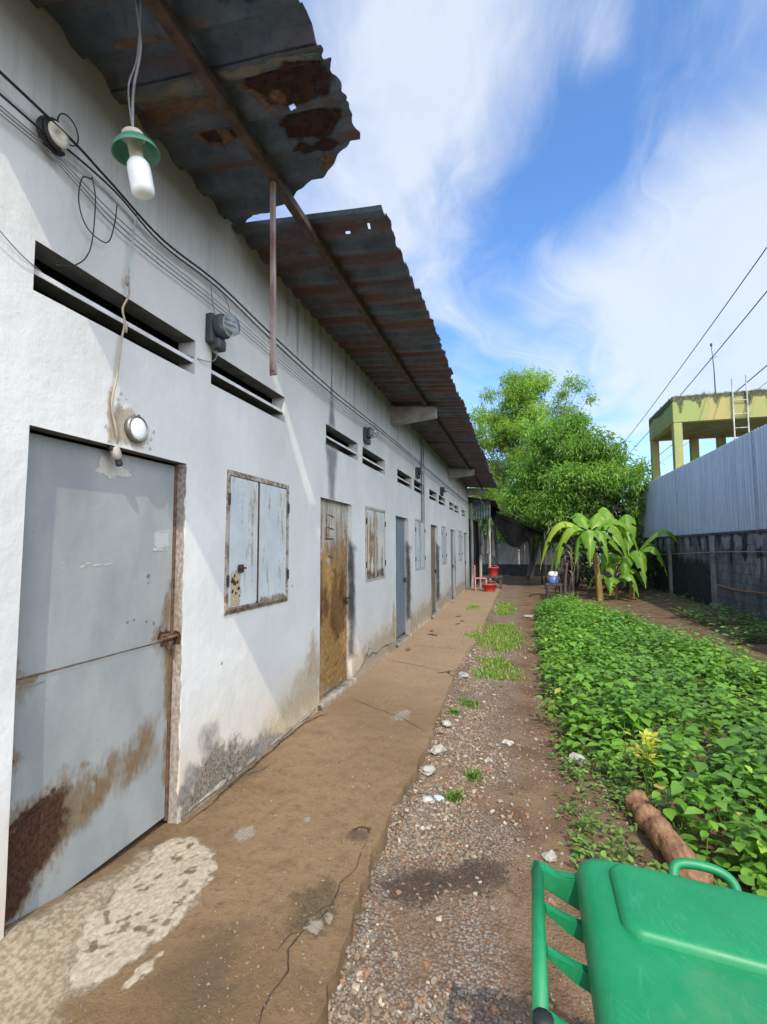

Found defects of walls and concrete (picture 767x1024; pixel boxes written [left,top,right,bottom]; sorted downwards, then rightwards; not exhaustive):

rust [125,77,237,147]
rust [220,53,341,170]
flaking render [105,391,155,450]
rust [367,518,384,578]
rust [226,572,287,615]
rust [319,514,347,699]
damp [178,731,275,821]
rust [4,761,114,925]
peeling [84,842,197,956]
peeling [123,951,164,989]
crack [259,845,365,1023]